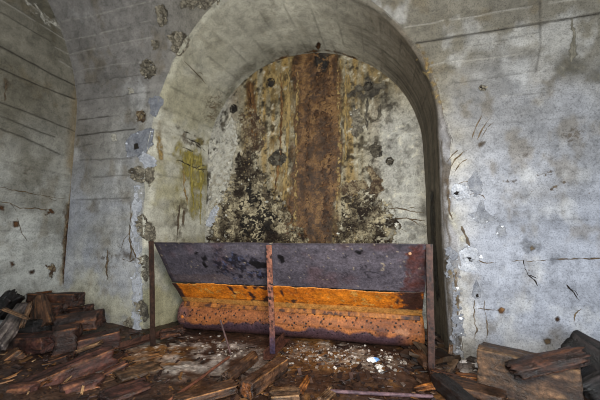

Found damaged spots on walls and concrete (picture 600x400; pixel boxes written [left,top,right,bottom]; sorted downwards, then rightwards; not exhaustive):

crack [0,187,64,240]
crack [120,205,139,262]
peeling [123,96,164,330]
spalling [139,58,156,79]
spalling [166,31,190,56]
water stain [176,131,205,235]
water stain [266,56,296,207]
rust [284,53,343,243]
water stain [308,42,398,164]
peeling [445,246,493,358]
crack [515,256,600,264]